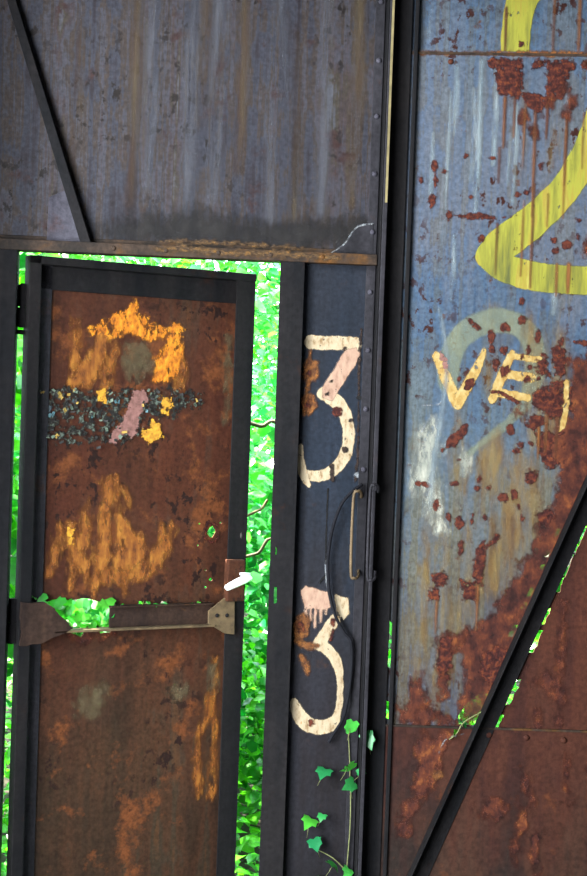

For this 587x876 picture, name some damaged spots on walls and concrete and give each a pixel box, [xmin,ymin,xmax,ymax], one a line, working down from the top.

rust [418,160,447,209]
rust [464,0,587,294]
peeling [38,383,205,449]
rust [395,297,587,839]
rust [193,657,219,800]